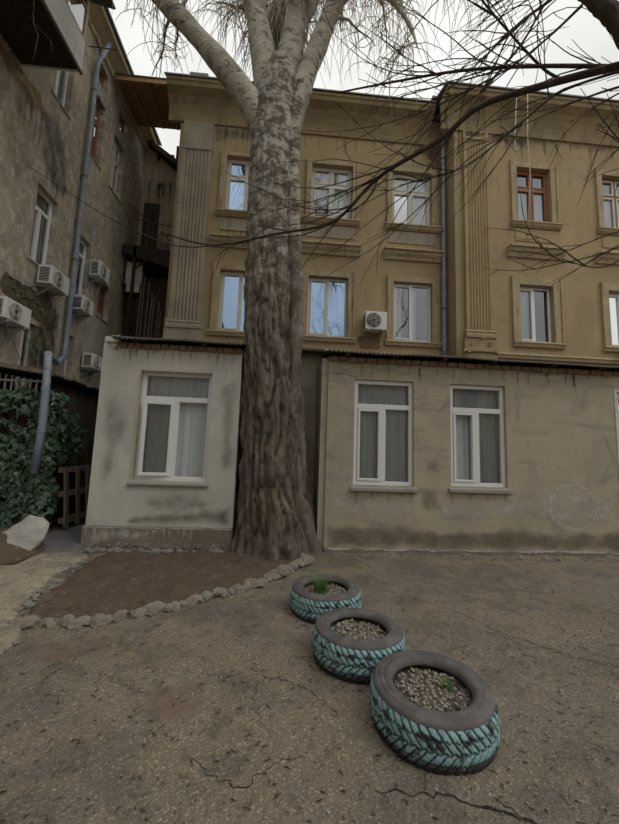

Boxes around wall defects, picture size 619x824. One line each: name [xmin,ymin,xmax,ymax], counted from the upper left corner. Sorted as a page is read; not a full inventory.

damp [483,533,589,548]